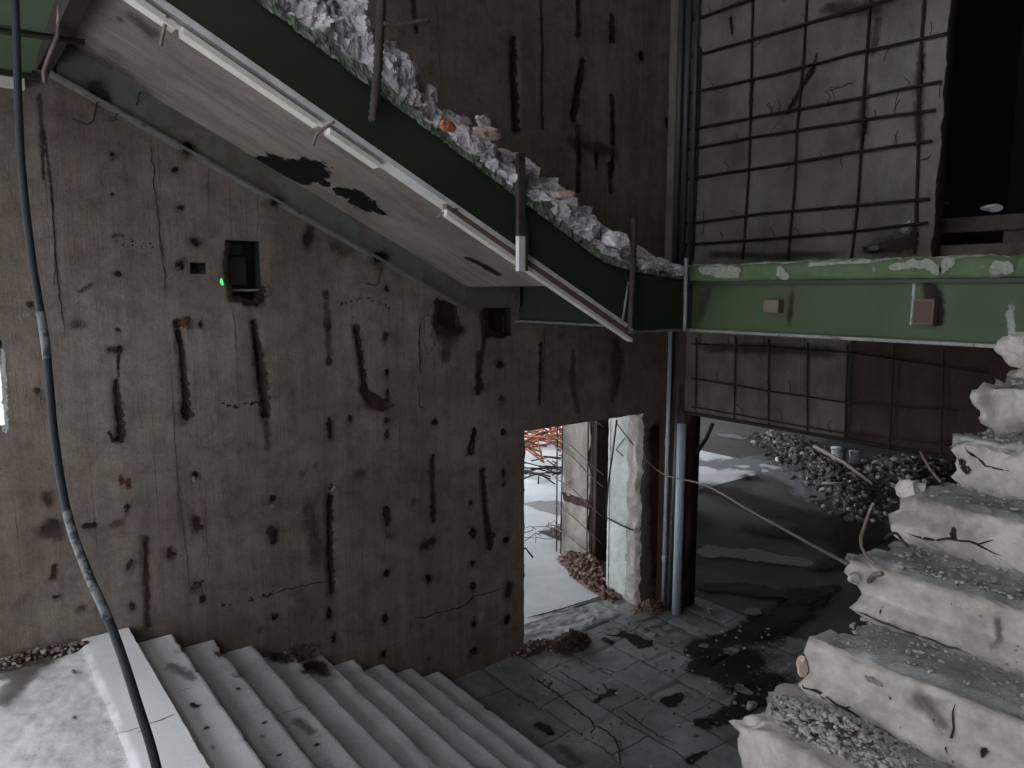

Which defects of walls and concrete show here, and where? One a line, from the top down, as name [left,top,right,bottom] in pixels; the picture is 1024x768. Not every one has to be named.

spalling [368,0,386,123]
peeling [255,152,387,215]
spalling [808,220,956,275]
spalling [621,217,638,329]
peeling [698,264,741,279]
peeling [990,260,1014,275]
spalling [958,458,971,474]
crack [964,446,1008,471]
crack [908,527,1001,556]
leakage [602,627,653,648]
leakage [683,582,840,729]
leakage [659,692,684,707]